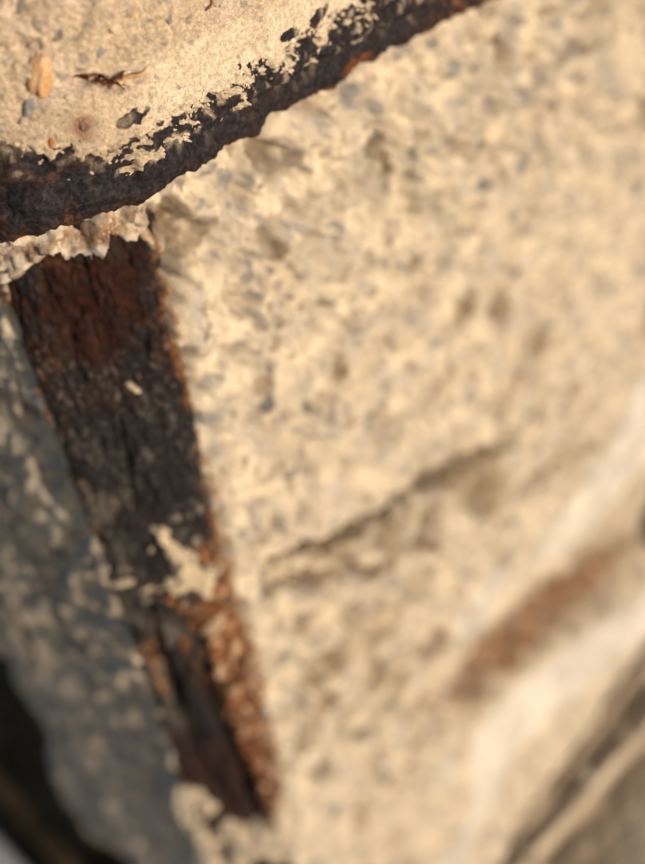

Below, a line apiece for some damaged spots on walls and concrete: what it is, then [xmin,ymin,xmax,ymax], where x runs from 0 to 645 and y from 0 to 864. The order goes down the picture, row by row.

rust [0,245,39,263]
rust [57,214,119,249]
spalling [146,0,645,864]
spalling [0,285,196,864]
rust [161,531,285,812]